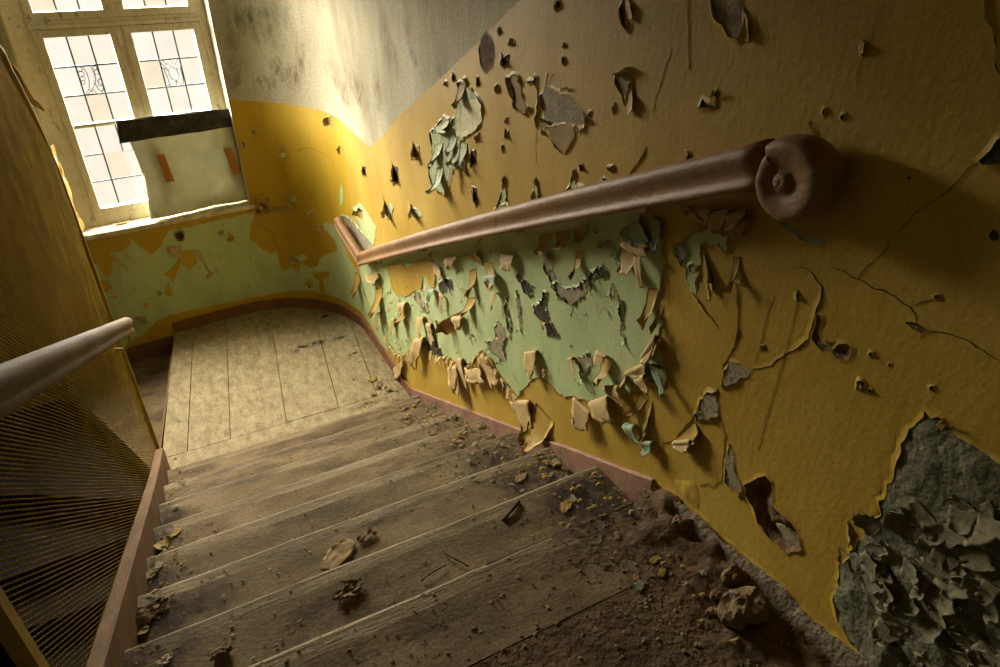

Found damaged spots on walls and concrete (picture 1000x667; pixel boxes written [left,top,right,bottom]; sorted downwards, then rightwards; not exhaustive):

peeling [410,25,593,209]
peeling [610,64,635,115]
peeling [708,0,749,47]
peeling [50,144,755,457]
crack [662,162,1000,490]
peeling [638,404,1000,667]